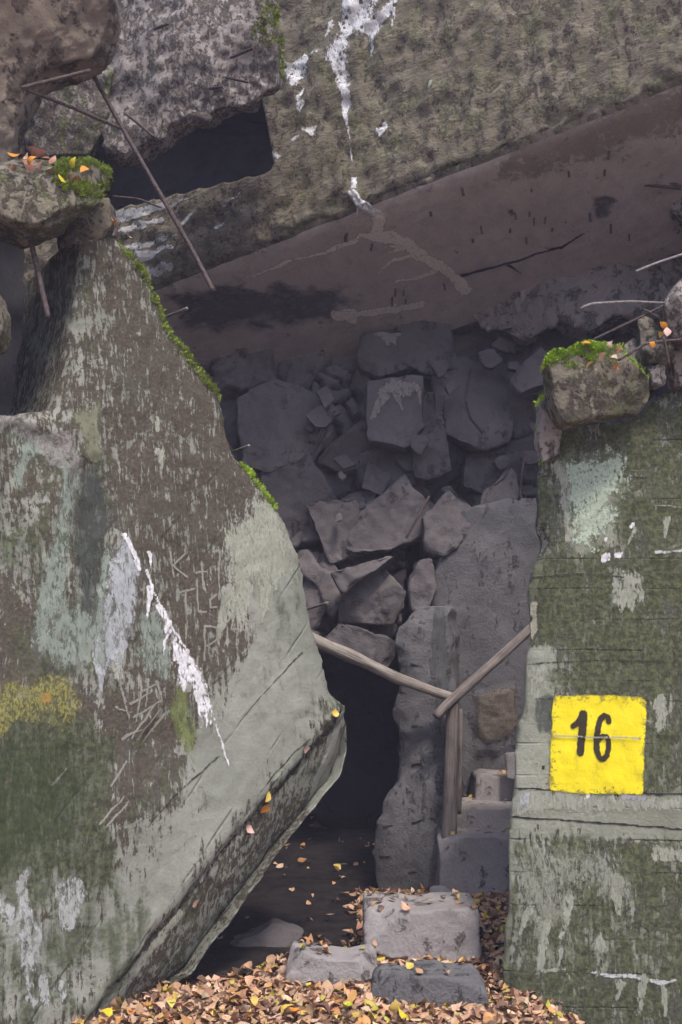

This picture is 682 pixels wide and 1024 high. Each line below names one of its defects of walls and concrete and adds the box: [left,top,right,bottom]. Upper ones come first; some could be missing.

damp [284,0,397,160]
crack [214,208,585,325]